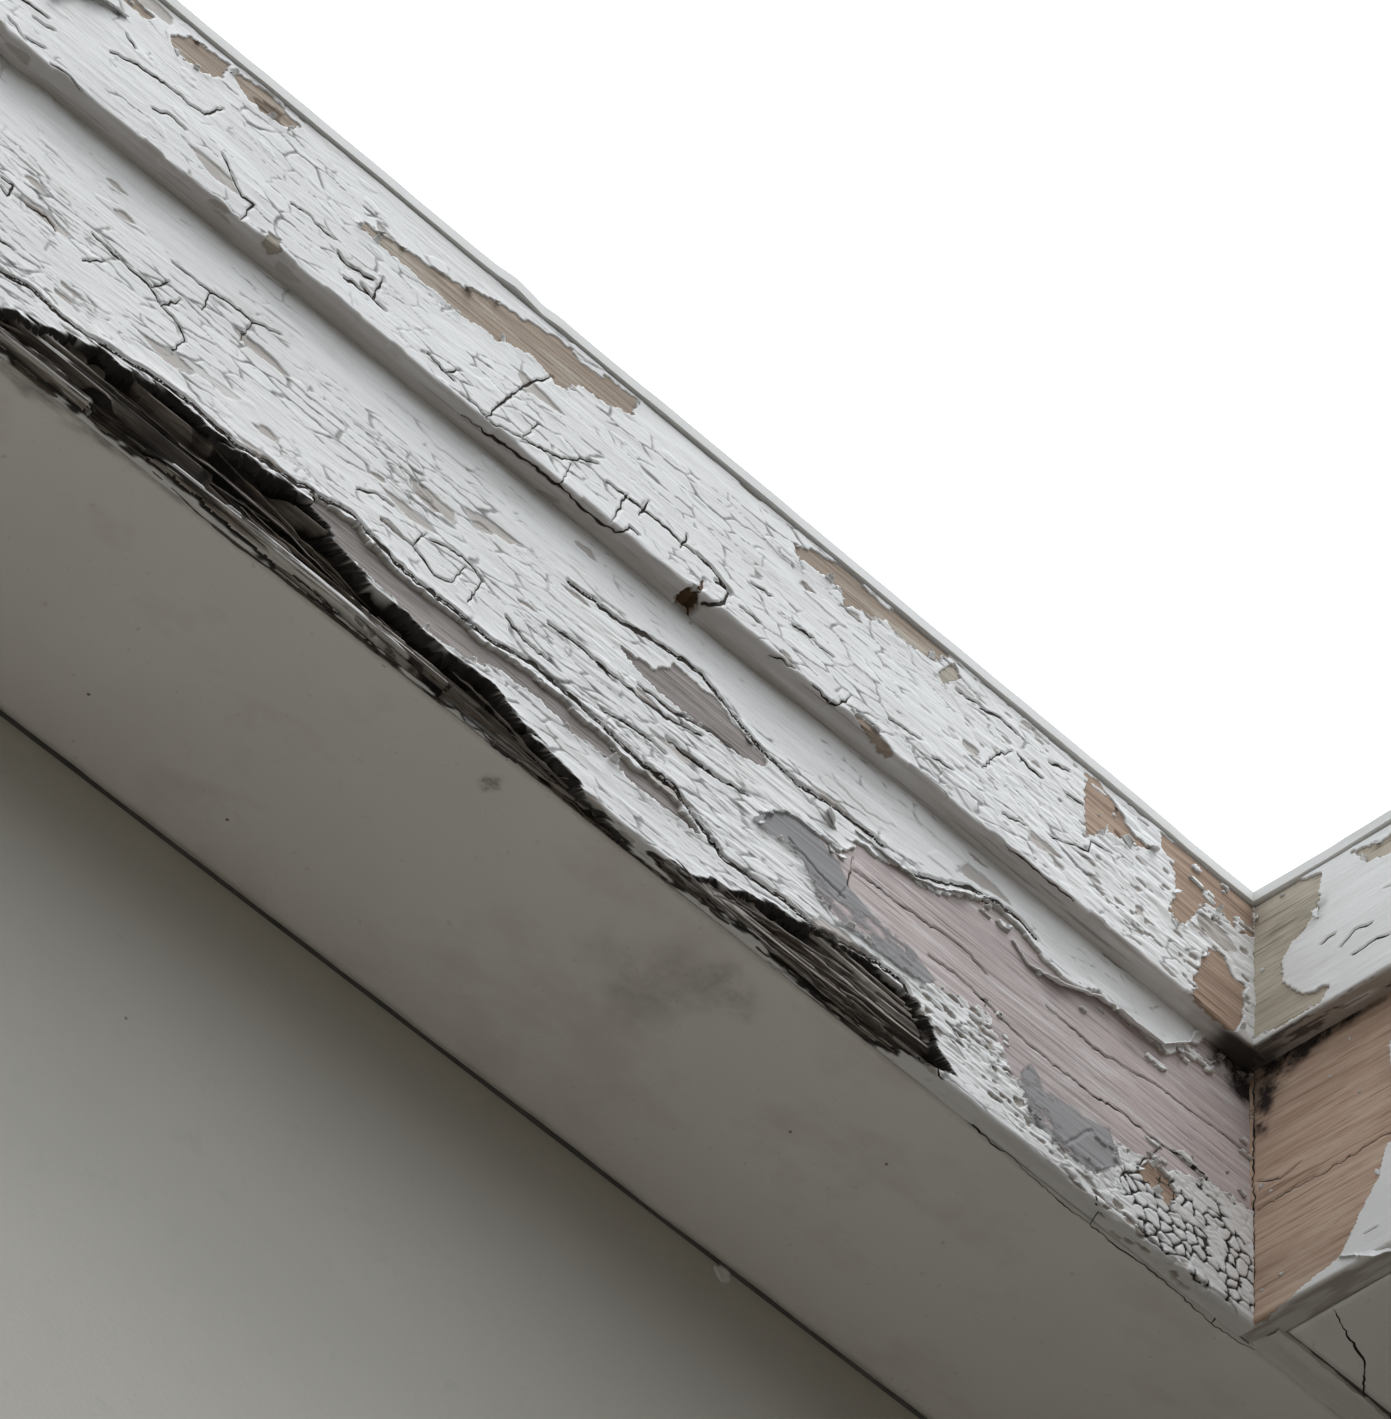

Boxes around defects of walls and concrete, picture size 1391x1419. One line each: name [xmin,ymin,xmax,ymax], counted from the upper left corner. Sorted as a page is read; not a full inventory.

crack [7,0,80,90]
crack [110,35,223,130]
peeling [170,36,300,131]
crack [1,177,56,232]
crack [222,155,255,220]
crack [290,203,385,311]
peeling [358,222,641,415]
peeling [311,502,691,829]
peeling [623,651,765,765]
peeling [794,544,959,684]
crack [0,233,1391,1350]
peeling [804,773,1391,1324]